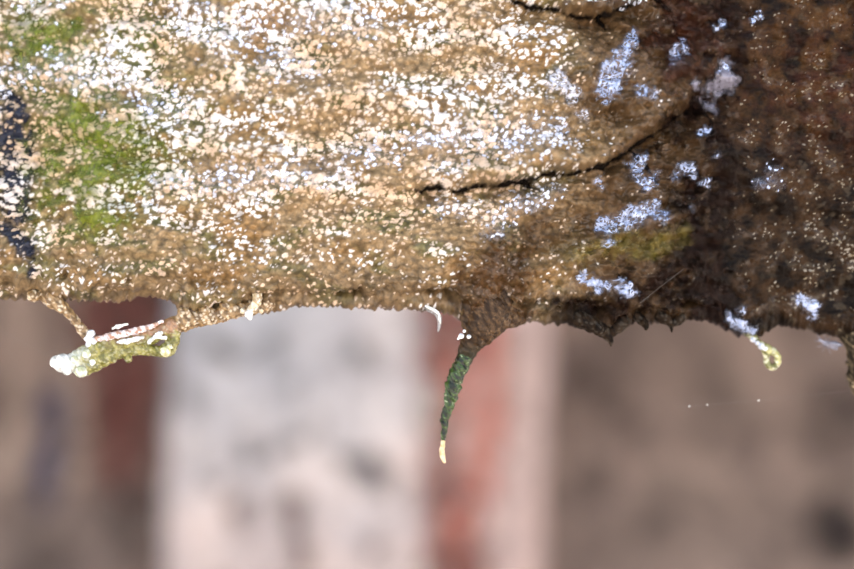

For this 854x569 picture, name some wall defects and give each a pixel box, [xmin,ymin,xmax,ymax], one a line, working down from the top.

leakage [11,0,75,14]
crack [511,0,677,31]
leakage [0,37,204,277]
crack [414,91,713,194]
leakage [796,293,821,320]
leakage [94,320,167,345]